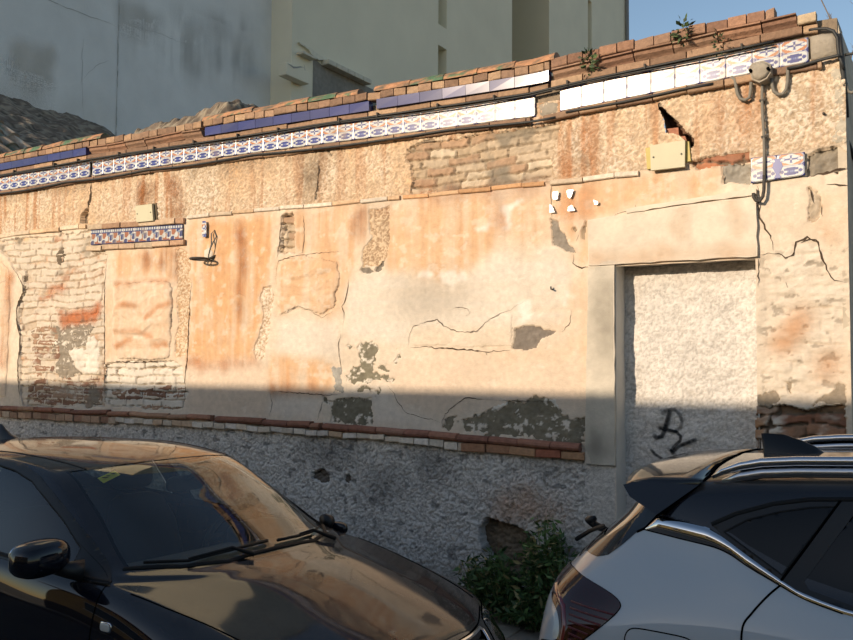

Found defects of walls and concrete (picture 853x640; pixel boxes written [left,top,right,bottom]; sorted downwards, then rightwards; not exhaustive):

flaking render [406,124,561,194]
crack [810,168,848,214]
flaking render [361,206,391,274]
flaking render [551,219,587,253]
crack [757,186,842,282]
flaking render [0,213,191,410]
crack [409,307,514,353]
flaking render [513,326,555,350]
flaking render [324,341,401,425]
peeling [443,395,585,443]
flaking render [754,383,847,448]
flaking render [485,518,539,586]